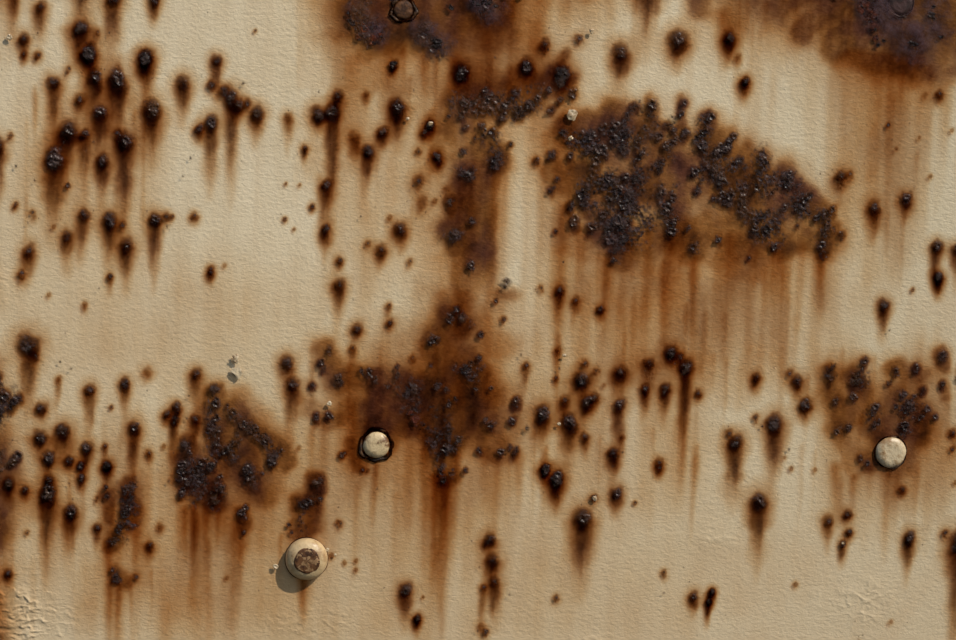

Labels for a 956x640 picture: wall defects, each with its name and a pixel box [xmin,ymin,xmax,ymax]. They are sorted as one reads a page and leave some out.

rust [18,0,46,60]
rust [176,74,190,107]
rust [194,53,265,158]
rust [739,0,956,101]
rust [18,243,35,280]
rust [148,212,175,259]
rust [280,0,847,547]
rust [0,333,142,553]
rust [128,420,152,461]
rust [162,367,300,537]
rust [787,345,950,473]
rust [573,494,598,569]